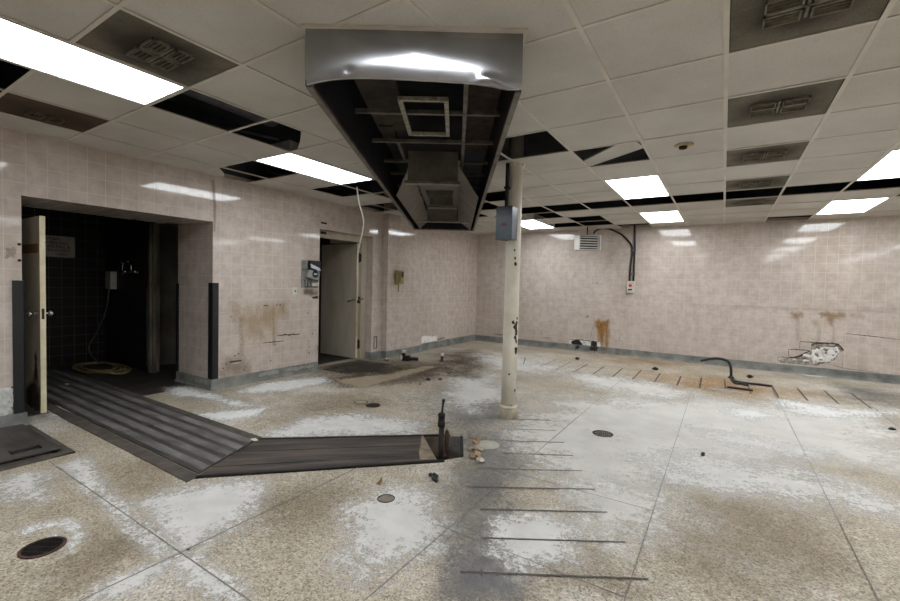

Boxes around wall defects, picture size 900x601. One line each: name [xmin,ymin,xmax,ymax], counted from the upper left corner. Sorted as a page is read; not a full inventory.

corrosion [596,321,607,342]
spalling [779,341,844,369]
leakage [0,457,271,601]
leakage [165,350,900,601]